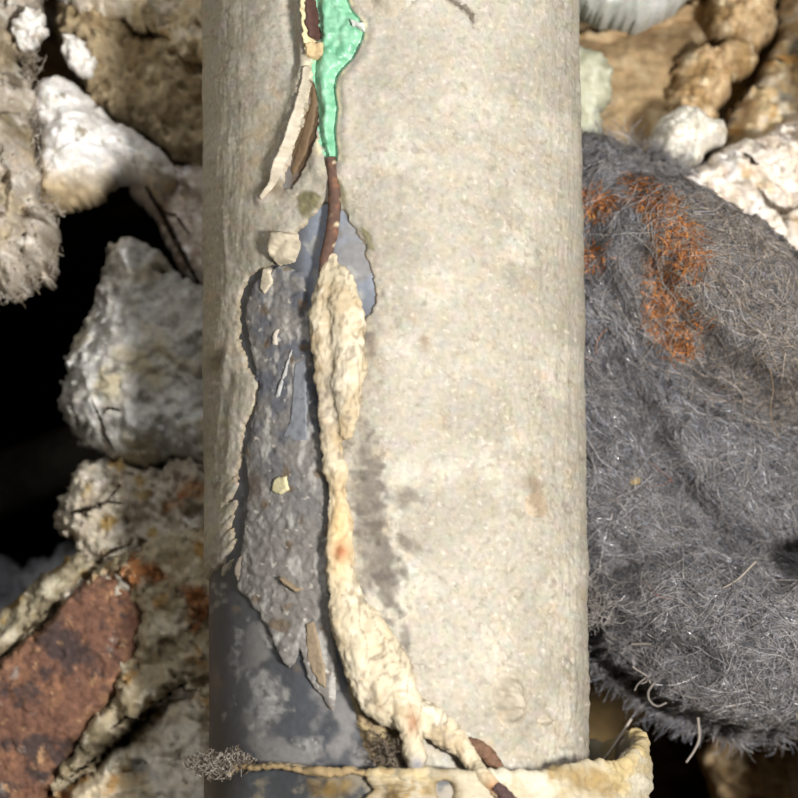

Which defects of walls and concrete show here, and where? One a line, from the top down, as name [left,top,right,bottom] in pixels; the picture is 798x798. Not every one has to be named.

crack [449,0,474,22]
peeling [234,231,337,712]